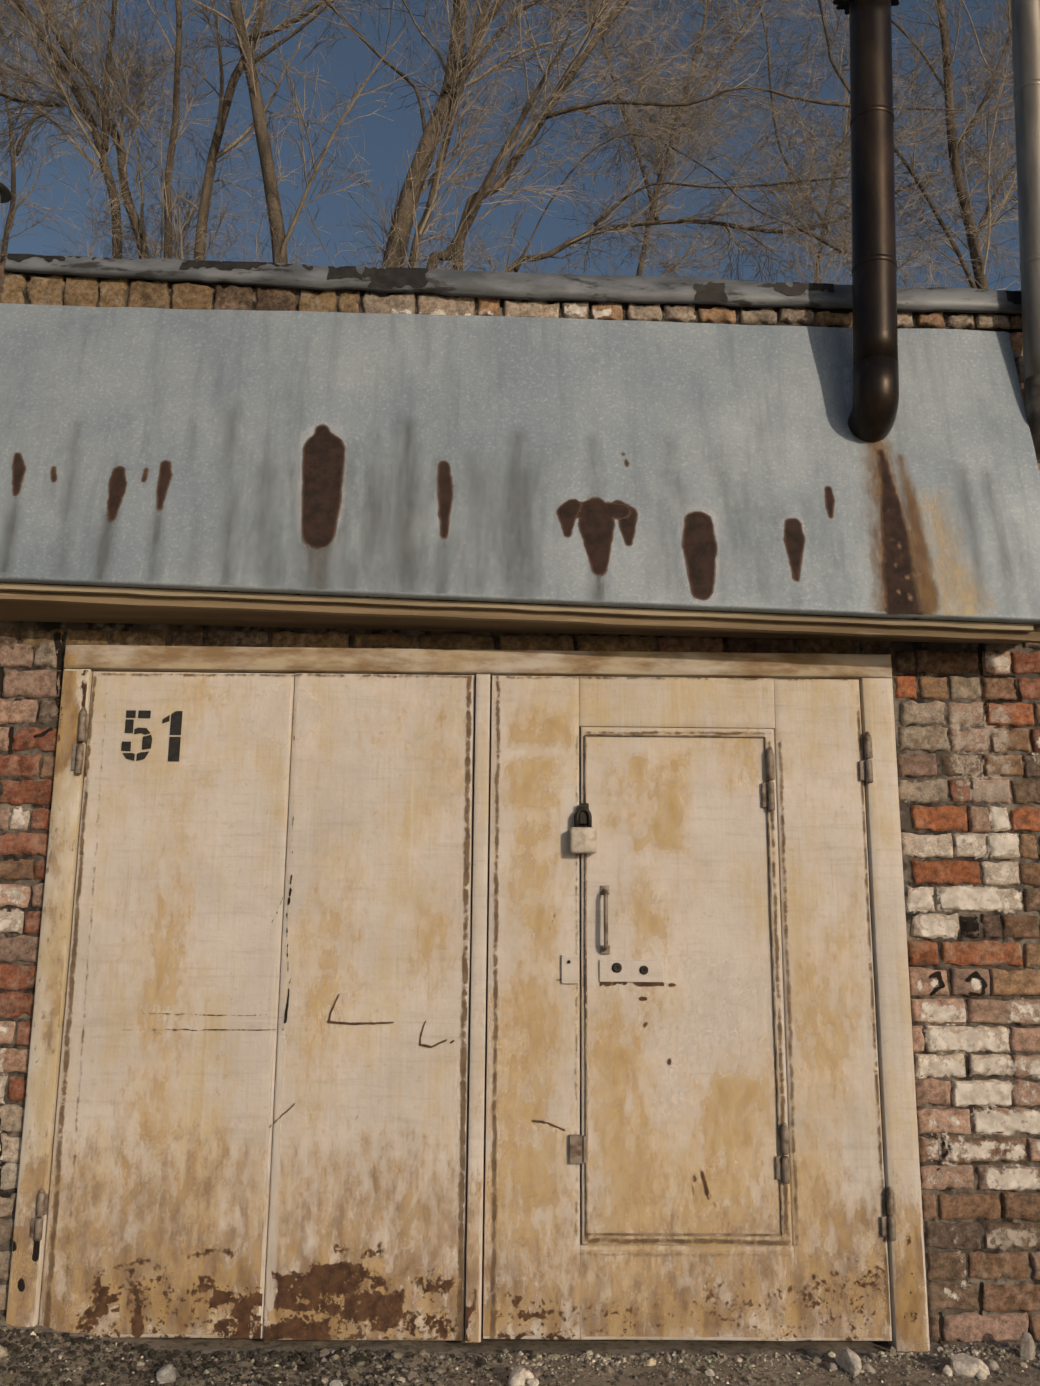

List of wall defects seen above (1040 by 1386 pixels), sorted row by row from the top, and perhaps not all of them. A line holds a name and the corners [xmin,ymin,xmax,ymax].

rust [2,452,26,573]
rust [96,460,172,580]
rust [301,425,345,589]
rust [437,461,453,538]
rust [557,497,638,599]
rust [682,511,717,600]
rust [783,518,805,581]
rust [825,486,835,518]
rust [868,440,975,619]
rust [6,652,928,1352]